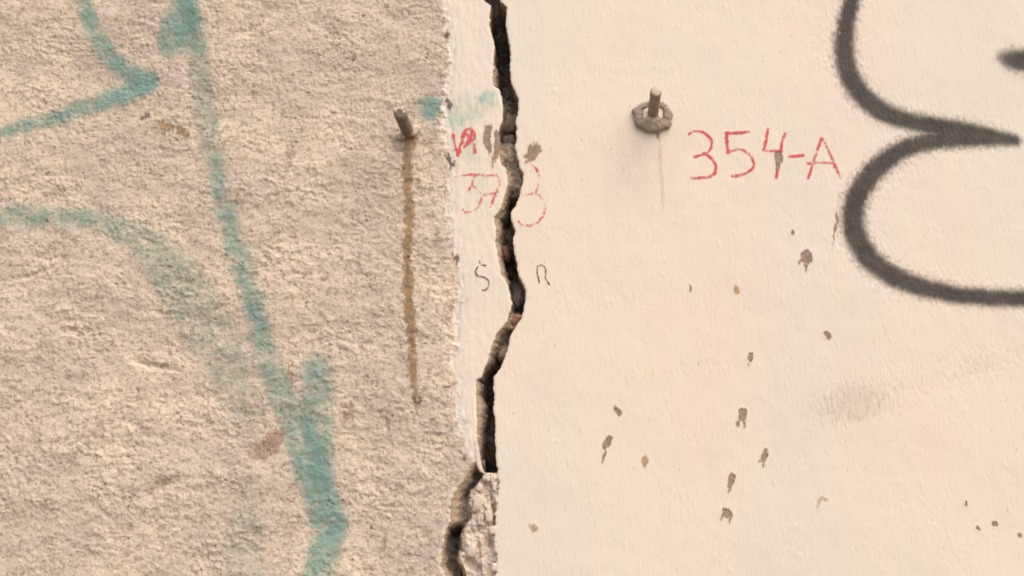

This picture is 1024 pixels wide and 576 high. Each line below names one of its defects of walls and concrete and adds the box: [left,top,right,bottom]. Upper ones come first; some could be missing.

rust [401,137,419,398]
crack [435,0,526,576]
peeling [799,249,813,272]
peeling [602,435,613,463]
peeling [736,408,747,428]
spalling [457,473,500,576]